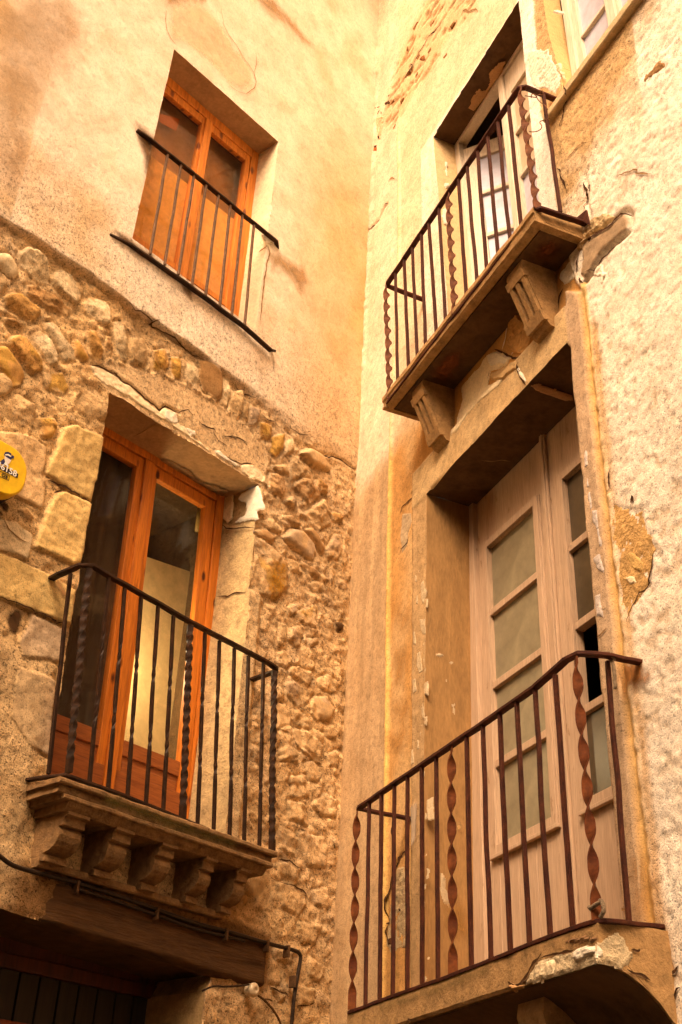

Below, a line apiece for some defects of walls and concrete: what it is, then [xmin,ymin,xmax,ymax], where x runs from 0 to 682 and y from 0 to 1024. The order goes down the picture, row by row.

crack [221,11,257,94]
peeling [469,61,505,111]
flaking render [560,214,615,285]
peeling [451,351,573,435]
flaking render [584,451,656,618]
spalling [509,933,633,993]